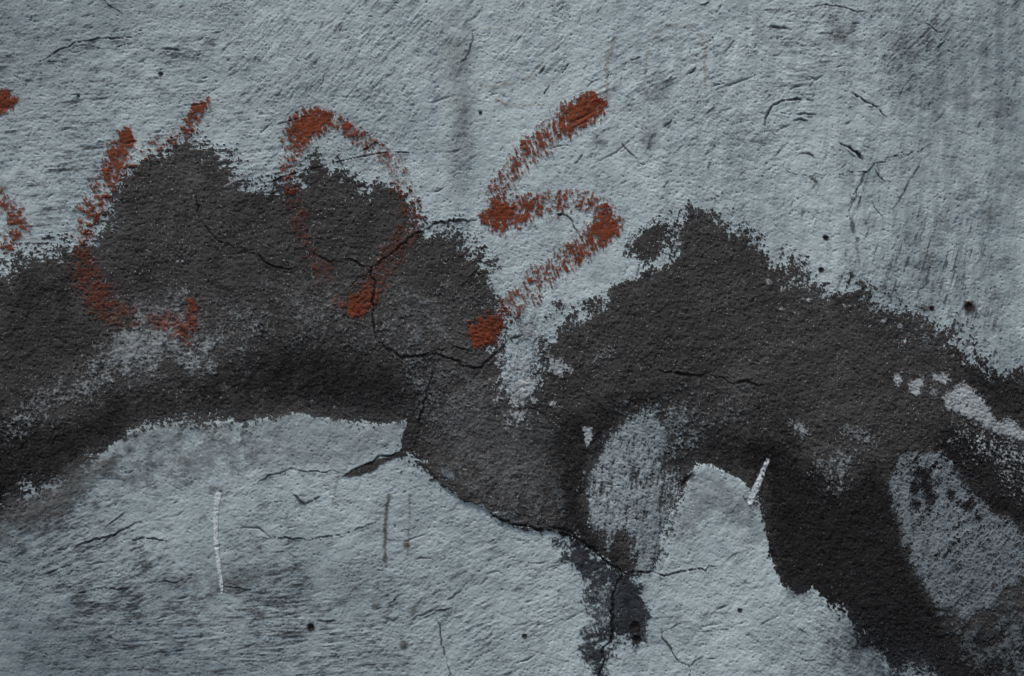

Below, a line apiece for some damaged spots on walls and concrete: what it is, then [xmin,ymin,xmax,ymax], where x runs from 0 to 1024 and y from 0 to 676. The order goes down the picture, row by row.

crack [313,219,517,432]
crack [662,371,762,386]
crack [347,454,395,475]
crack [495,516,712,676]